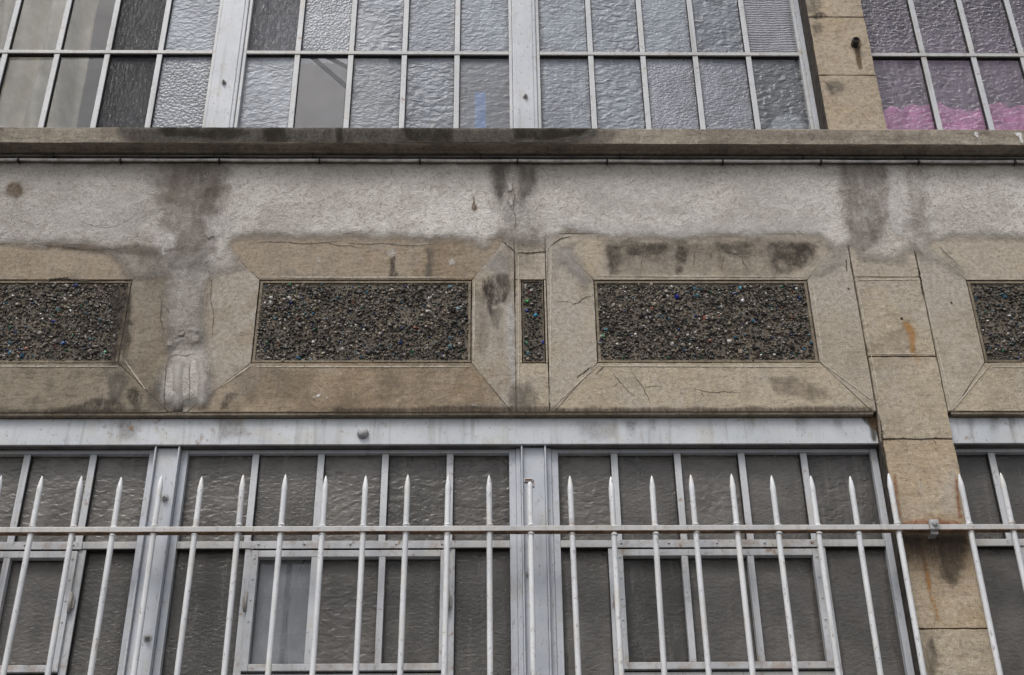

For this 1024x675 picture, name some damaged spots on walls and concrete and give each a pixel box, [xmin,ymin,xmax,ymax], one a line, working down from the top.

damp [609,244,686,273]
damp [484,275,509,313]
crack [577,366,660,403]